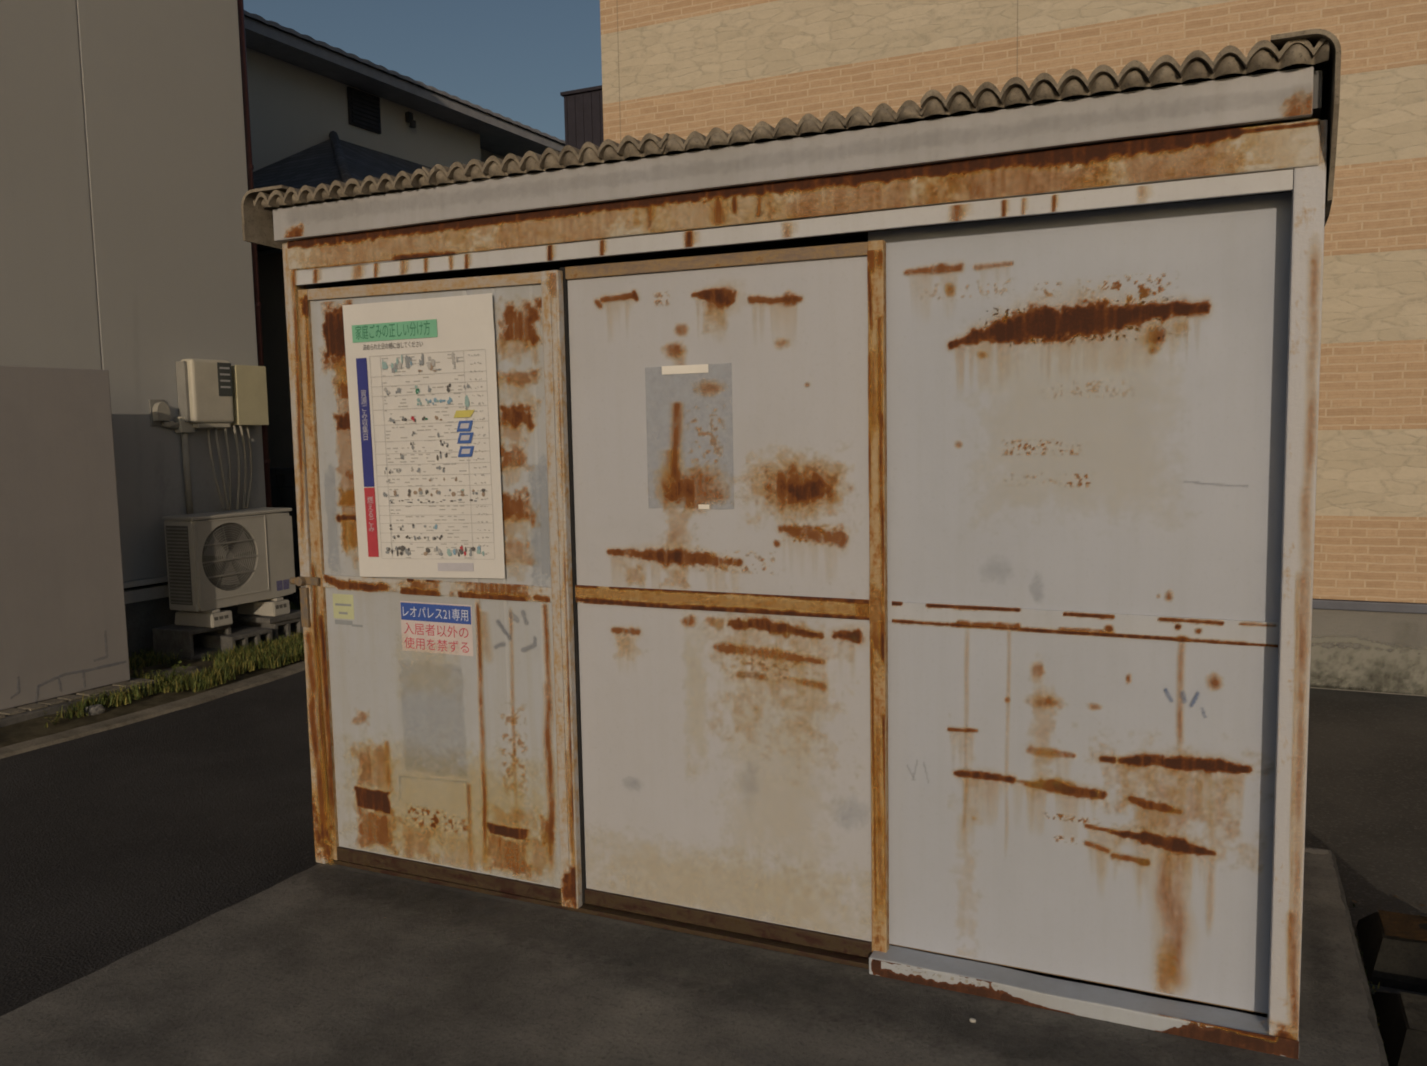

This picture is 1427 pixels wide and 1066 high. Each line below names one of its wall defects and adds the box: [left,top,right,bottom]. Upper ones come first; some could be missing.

corrosion [285,95,1322,552]
corrosion [306,250,1278,909]
corrosion [1296,579,1306,813]
corrosion [1053,791,1216,989]
corrosion [1159,913,1298,1041]